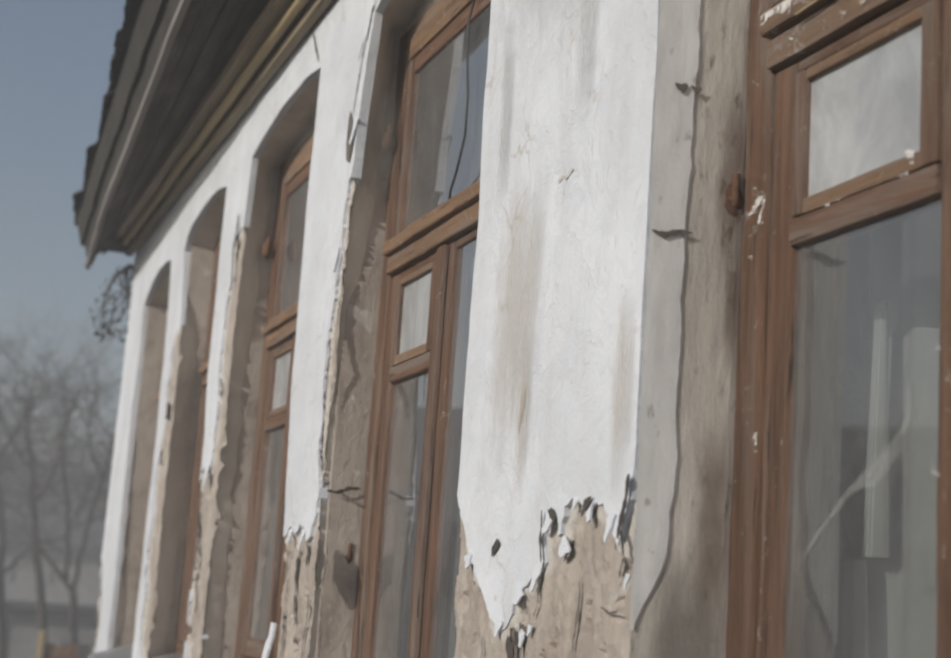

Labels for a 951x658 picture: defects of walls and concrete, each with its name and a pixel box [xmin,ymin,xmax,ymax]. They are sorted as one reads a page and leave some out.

flaking render [141,325,182,658]
flaking render [187,228,246,658]
flaking render [261,498,328,658]
flaking render [320,178,355,485]
flaking render [453,0,819,658]